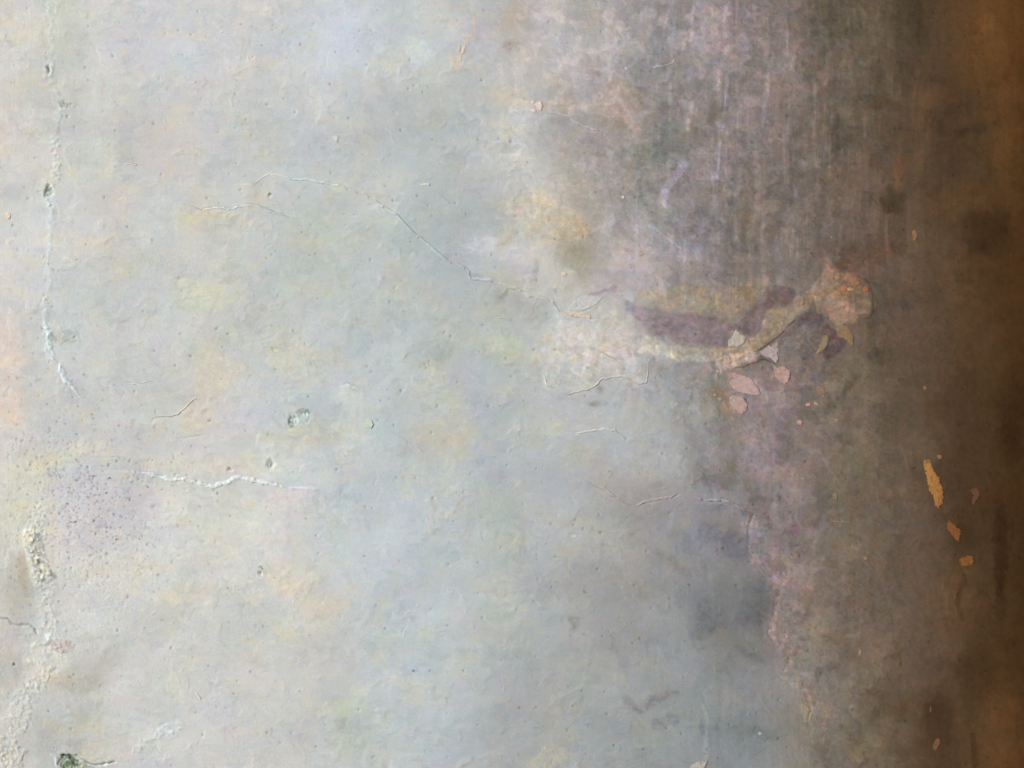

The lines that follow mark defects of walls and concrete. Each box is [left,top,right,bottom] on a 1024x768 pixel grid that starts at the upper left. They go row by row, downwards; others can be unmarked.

damp [475,0,701,221]
crack [40,0,83,401]
crack [185,173,589,321]
damp [455,186,600,365]
damp [587,275,798,347]
peeling [728,329,746,347]
peeling [729,373,761,415]
peeling [760,342,791,384]
peeling [810,255,877,364]
damp [602,426,703,486]
peeling [923,455,944,509]
damp [650,367,882,766]